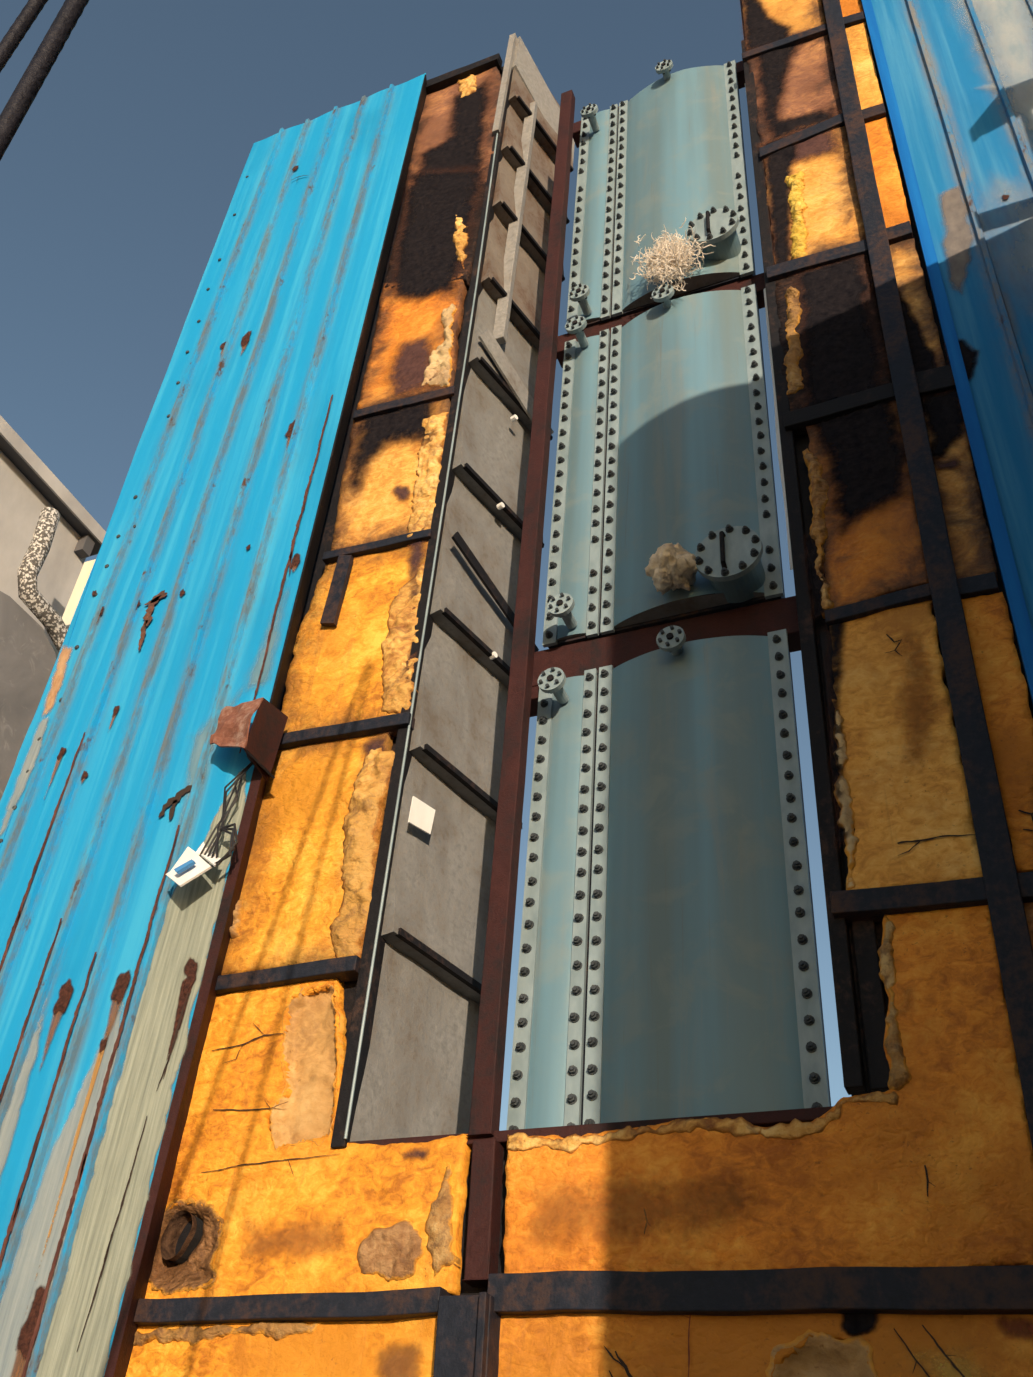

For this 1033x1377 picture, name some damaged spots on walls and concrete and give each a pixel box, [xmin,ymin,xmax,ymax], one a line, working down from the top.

corrosion [253,395,333,700]
corrosion [43,647,72,714]
corrosion [0,732,88,971]
corrosion [0,825,180,1377]
peeling [0,772,246,1377]
corrosion [167,958,198,1060]
spalling [269,981,347,1151]
crack [894,1325,965,1377]